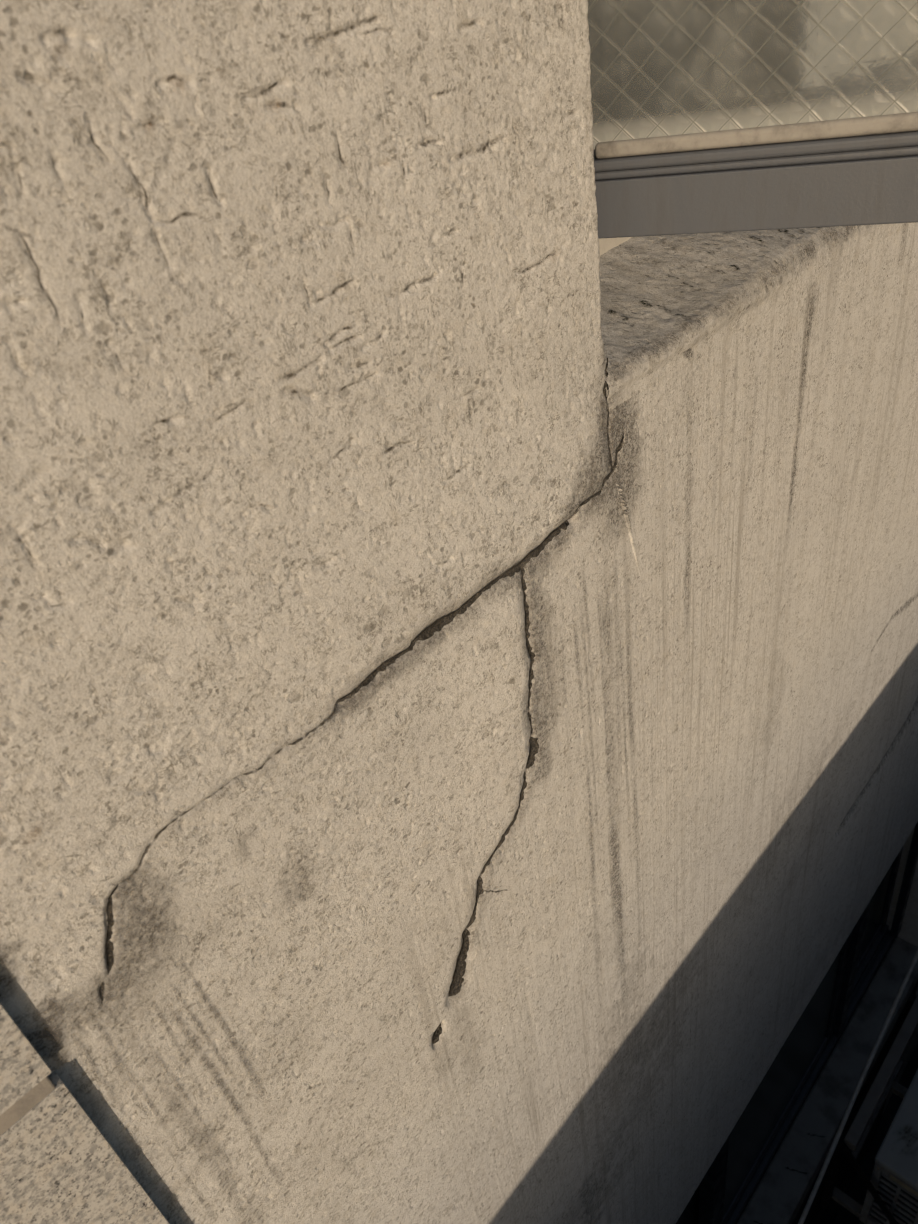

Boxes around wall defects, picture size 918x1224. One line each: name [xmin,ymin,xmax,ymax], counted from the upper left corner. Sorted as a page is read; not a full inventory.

crack [99,358,624,1006]